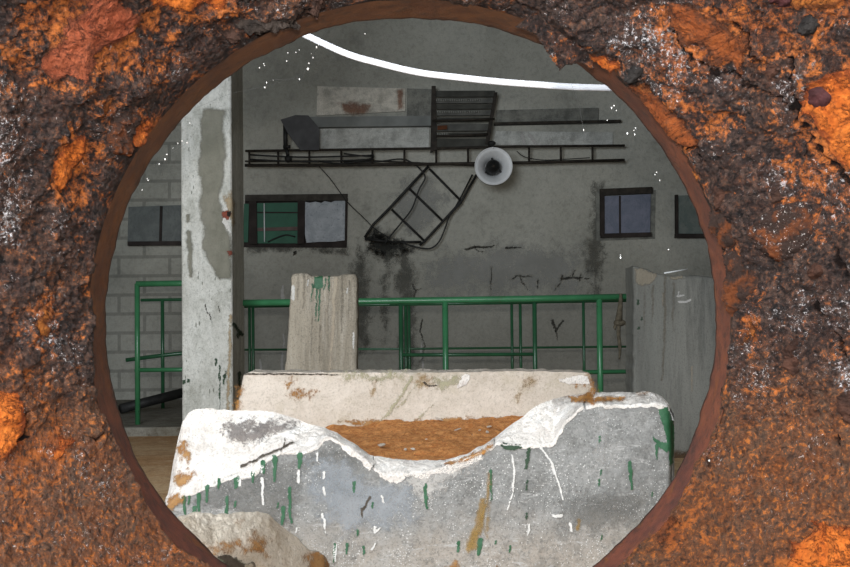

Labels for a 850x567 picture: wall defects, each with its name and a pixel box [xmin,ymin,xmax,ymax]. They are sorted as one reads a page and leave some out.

corrosion [38,0,140,85]
corrosion [798,68,850,172]
corrosion [52,135,86,193]
peeling [198,108,236,279]
water stain [313,248,374,370]
water stain [345,251,417,381]
corrosion [0,391,26,459]
corrosion [167,440,194,511]
crack [240,438,294,468]
spalling [165,374,675,505]
corrosion [568,376,625,405]
corrosion [786,520,850,567]